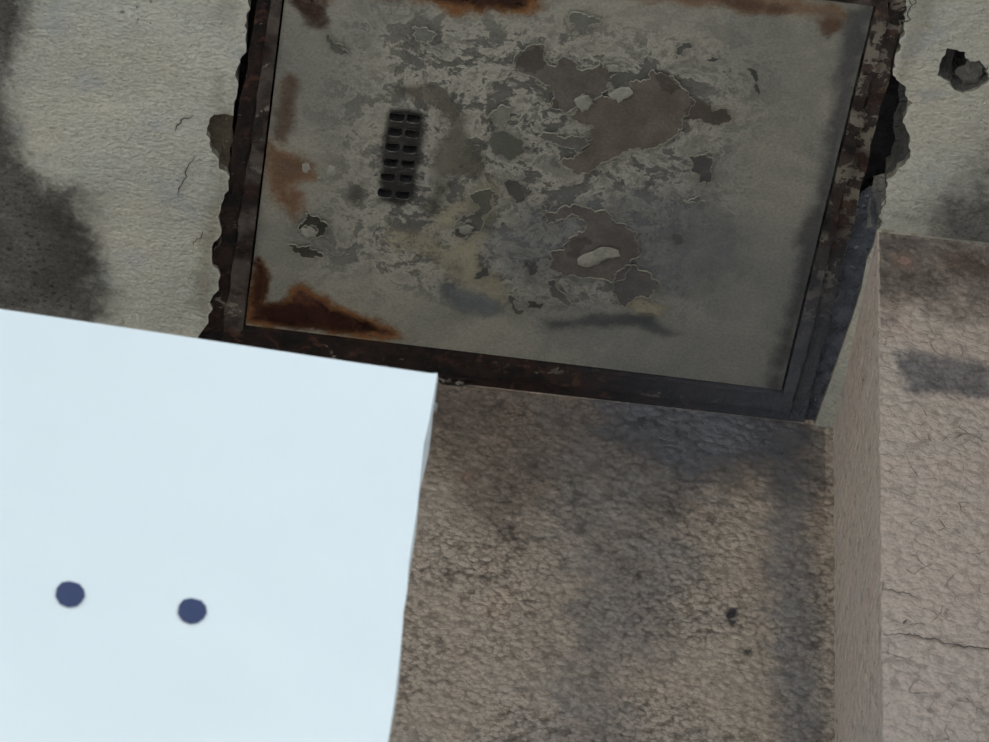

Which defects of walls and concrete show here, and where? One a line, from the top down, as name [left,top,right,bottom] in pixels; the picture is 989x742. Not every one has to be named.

water stain [0,0,18,75]
rust [292,0,328,28]
rust [419,0,540,16]
spalling [938,48,989,91]
peeling [488,104,524,161]
peeling [513,42,732,176]
water stain [0,107,96,323]
peeling [288,213,329,259]
peeling [453,180,526,238]
peeling [507,203,660,316]
peeling [683,154,714,206]
rust [246,260,401,340]